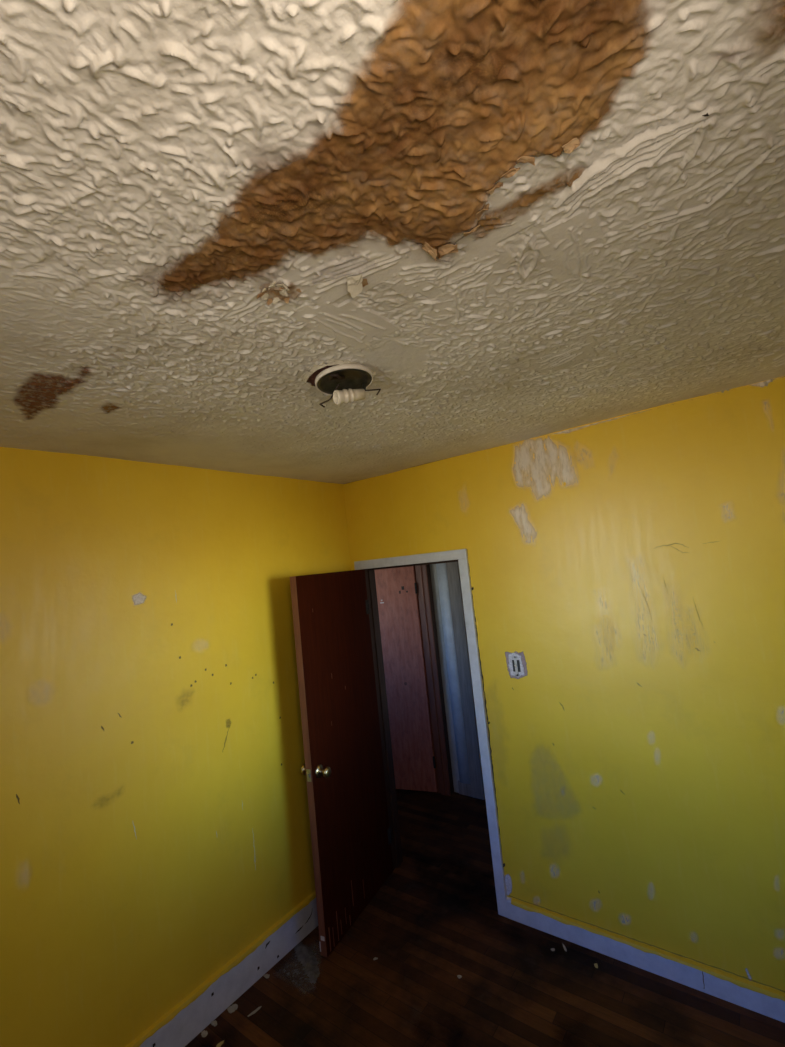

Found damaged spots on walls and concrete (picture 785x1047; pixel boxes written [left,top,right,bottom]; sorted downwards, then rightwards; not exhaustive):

water stain [162,0,647,292]
peeling [514,415,627,499]
peeling [512,505,535,542]